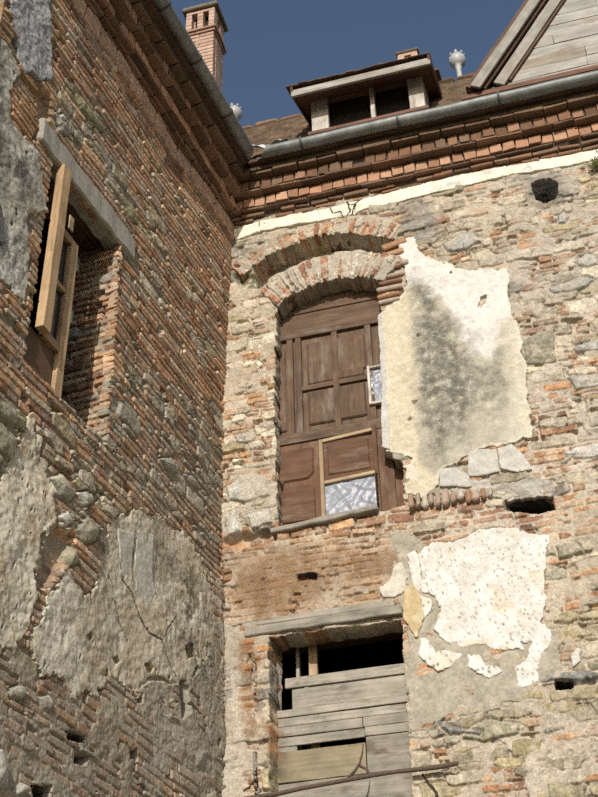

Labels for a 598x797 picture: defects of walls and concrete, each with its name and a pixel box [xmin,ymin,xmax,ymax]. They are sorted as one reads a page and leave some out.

crack [330,200,360,217]
peeling [405,465,420,480]
spalling [439,444,554,514]
peeling [117,529,156,606]
crack [109,537,180,685]
flaking render [390,531,561,730]